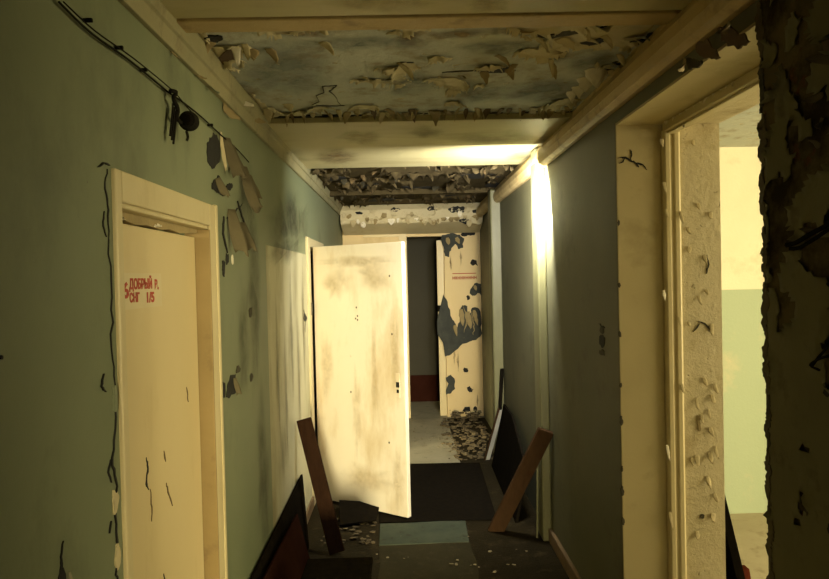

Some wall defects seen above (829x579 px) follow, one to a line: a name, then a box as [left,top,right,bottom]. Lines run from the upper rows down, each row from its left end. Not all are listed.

peeling [198,31,335,73]
peeling [206,132,263,277]
peeling [312,165,514,266]
crack [619,150,647,170]
peeling [437,283,482,357]
peeling [677,0,829,579]